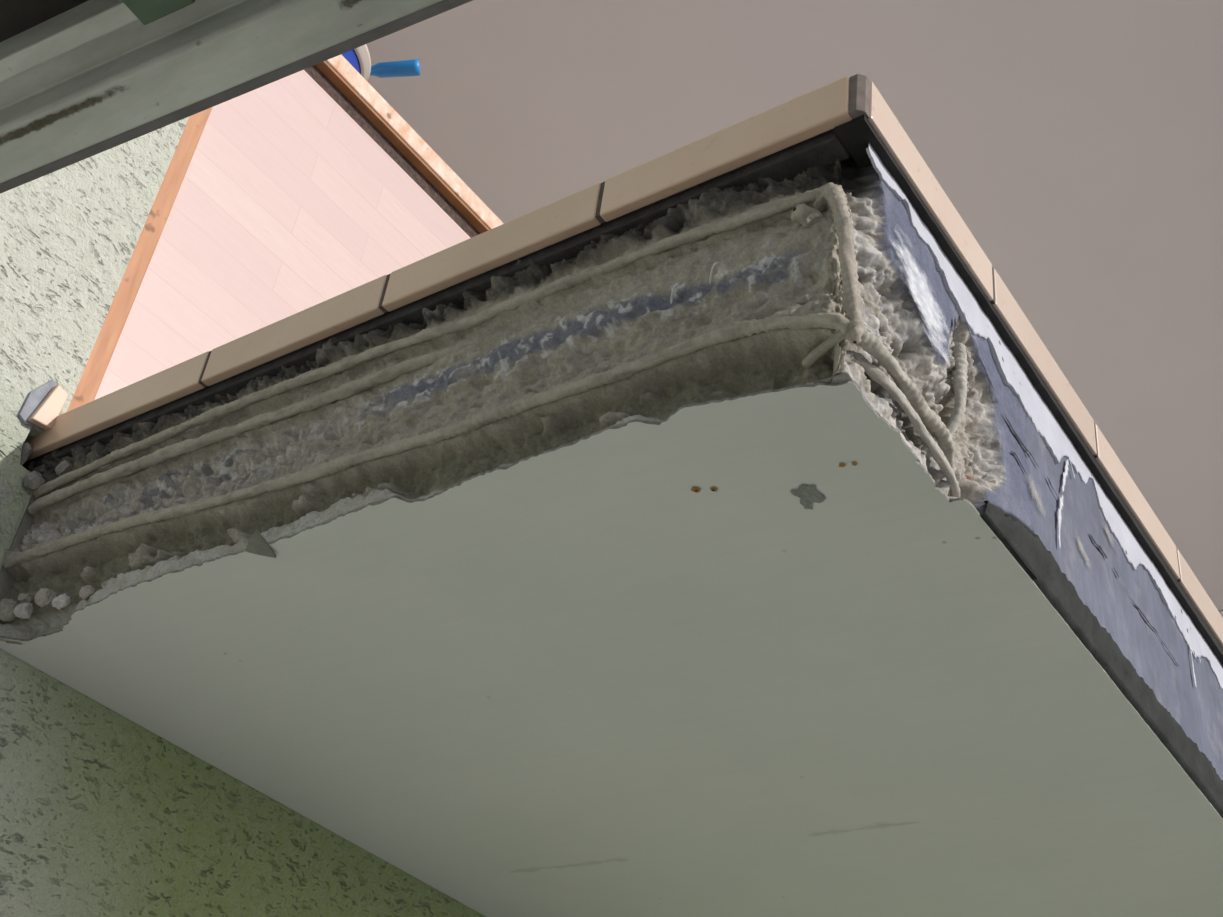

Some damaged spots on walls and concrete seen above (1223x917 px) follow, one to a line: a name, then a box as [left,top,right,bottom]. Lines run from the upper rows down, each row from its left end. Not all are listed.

spalling [0,143,1223,691]